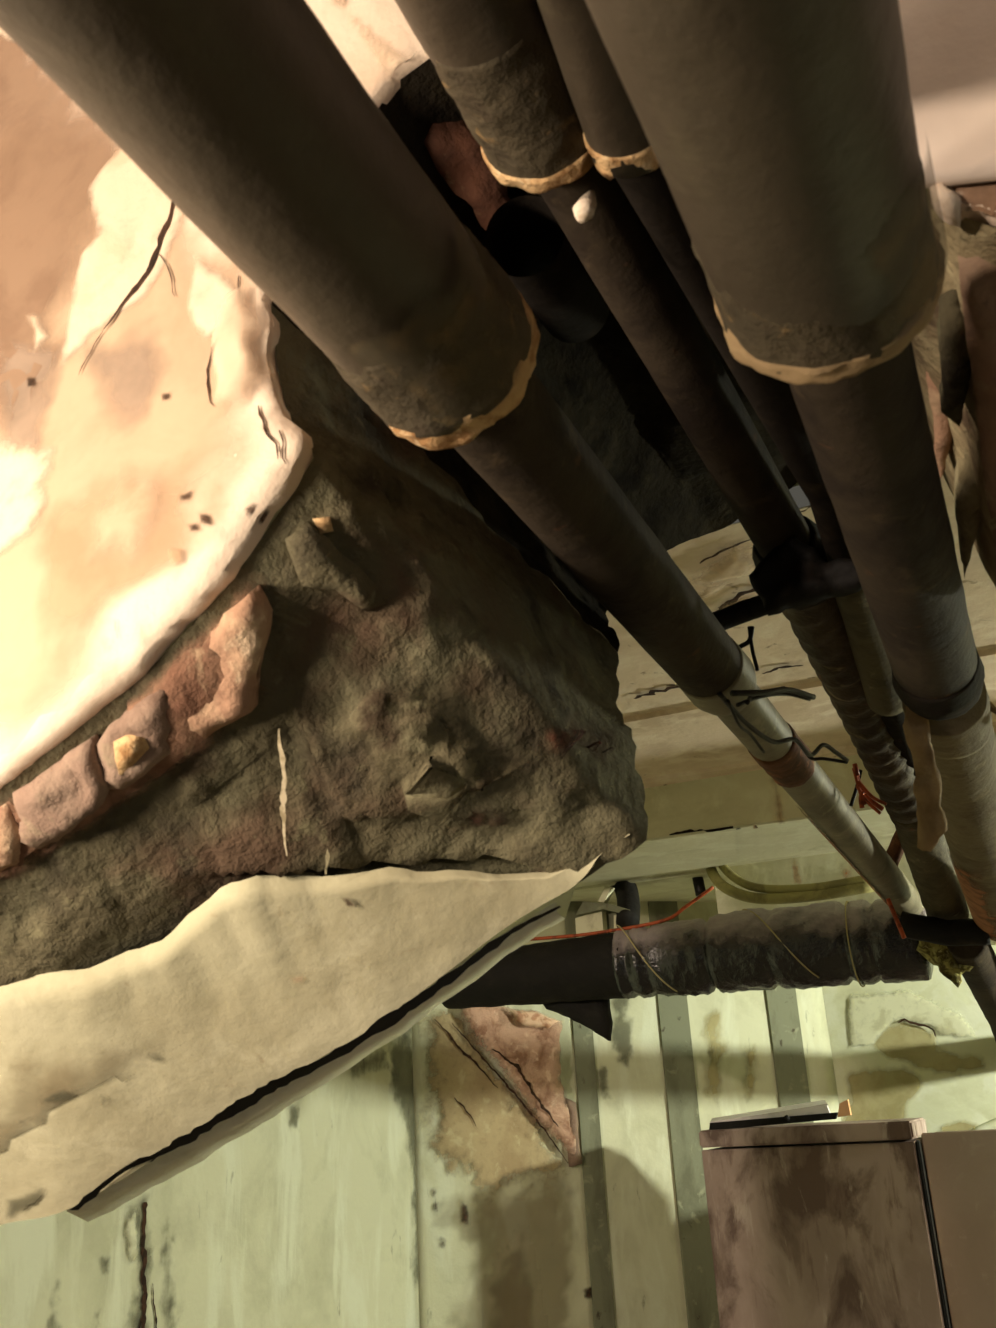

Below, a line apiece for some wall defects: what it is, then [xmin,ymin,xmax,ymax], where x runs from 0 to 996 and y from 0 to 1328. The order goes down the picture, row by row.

crack [79,201,175,373]
spalling [933,181,996,227]
spalling [0,305,648,986]
crack [70,906,560,1210]
leakage [352,1033,417,1215]
spalling [419,1006,582,1193]
crack [139,1202,157,1328]